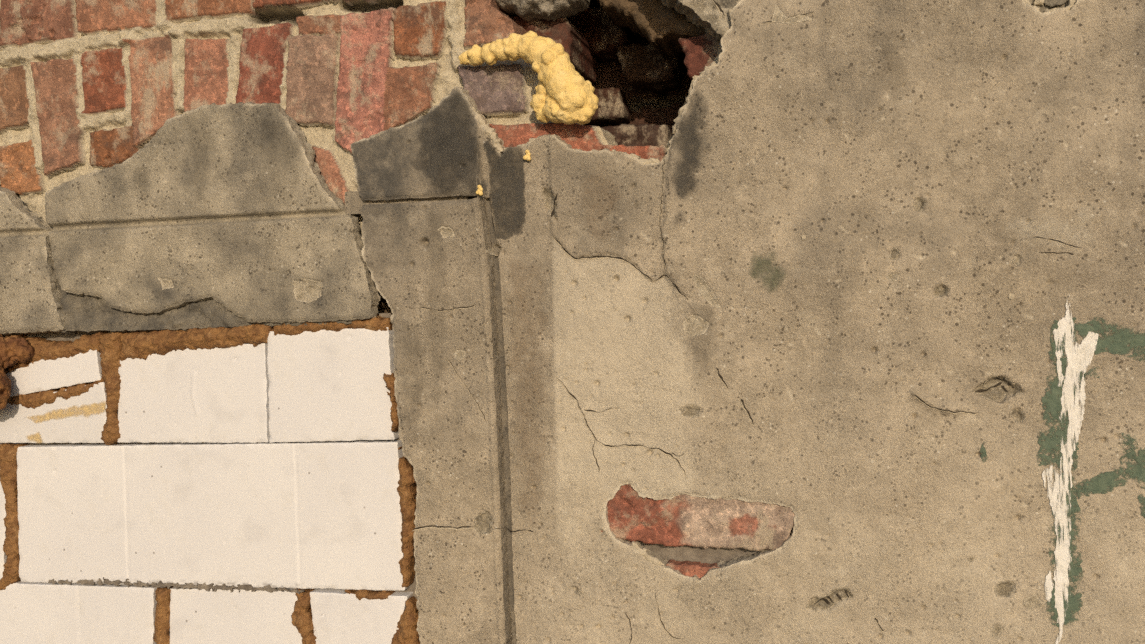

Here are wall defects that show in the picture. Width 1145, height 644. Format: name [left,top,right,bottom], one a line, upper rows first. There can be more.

spalling [1024,0,1076,13]
spalling [495,0,741,147]
spalling [542,189,558,220]
crack [551,158,686,297]
spalling [53,268,352,335]
crack [556,379,687,478]
spalling [601,484,795,578]